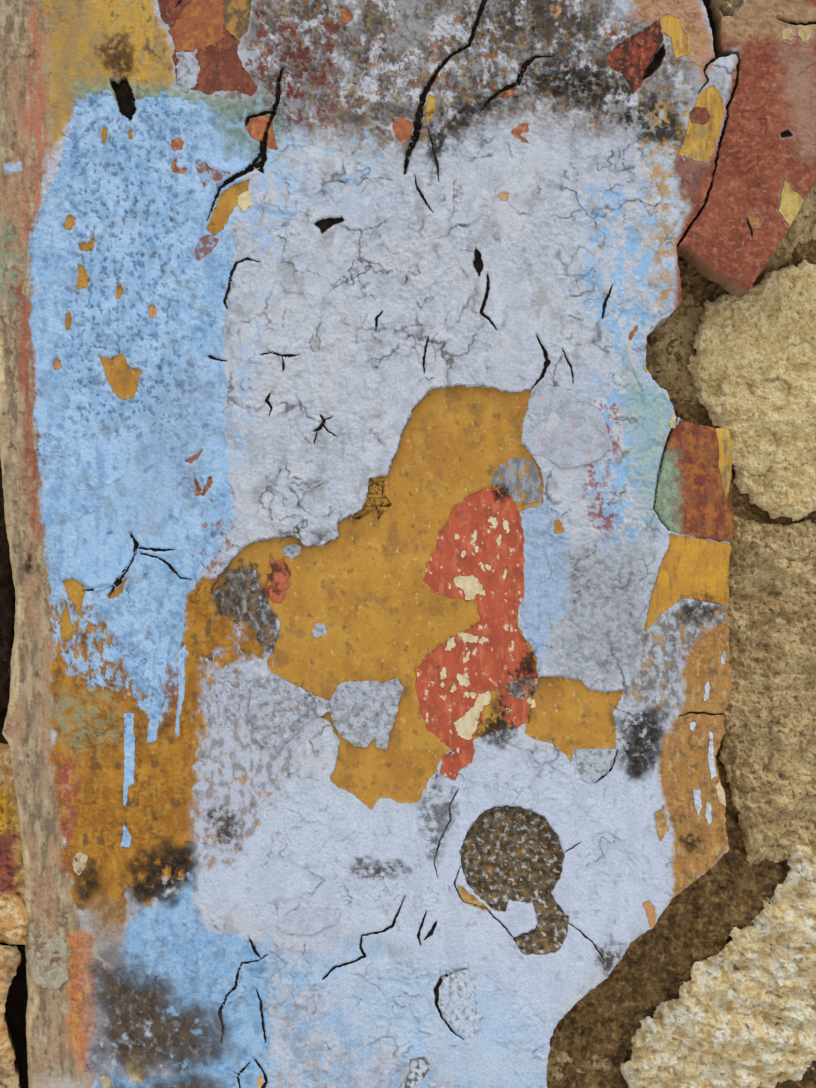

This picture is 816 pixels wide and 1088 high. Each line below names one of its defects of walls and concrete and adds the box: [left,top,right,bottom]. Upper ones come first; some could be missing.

spalling [111,79,136,139]
peeling [158,0,257,96]
crack [404,0,487,212]
crack [483,55,553,108]
peeling [678,86,724,163]
peeling [171,138,253,261]
peeling [99,354,142,399]
crack [86,534,192,595]
peeling [211,386,623,809]
peeling [645,413,734,630]
spalling [458,806,569,955]
crack [218,938,268,1088]